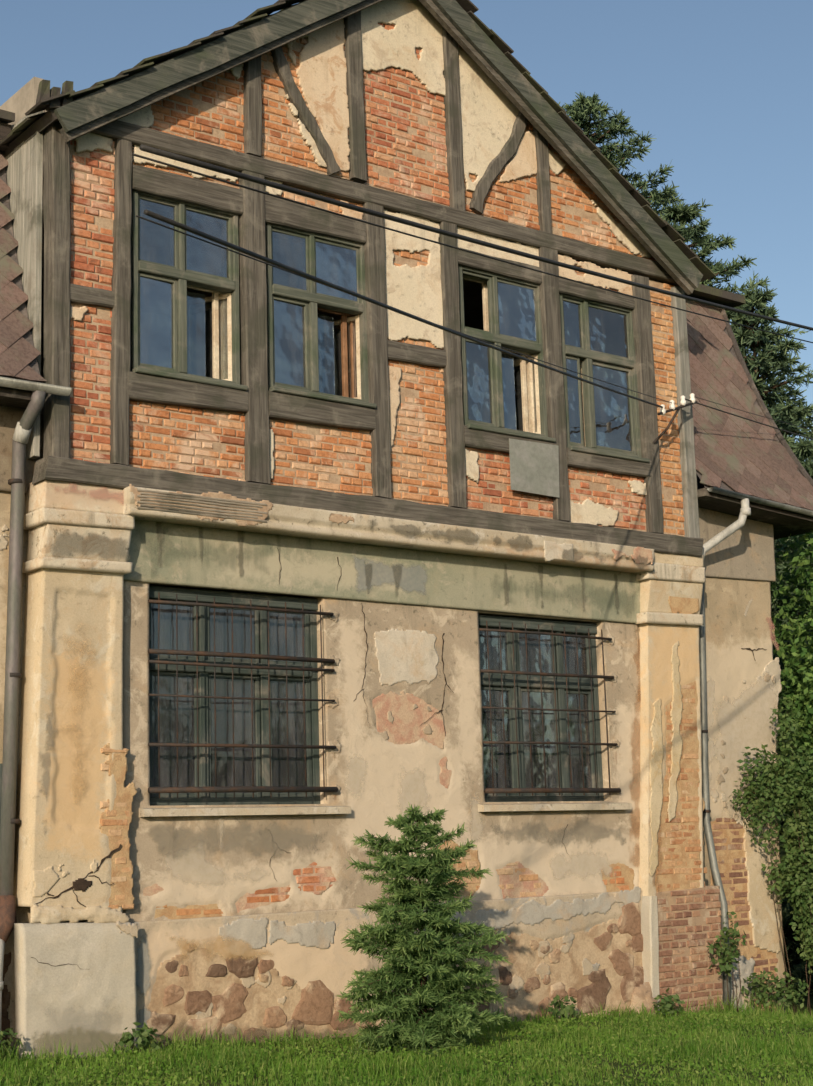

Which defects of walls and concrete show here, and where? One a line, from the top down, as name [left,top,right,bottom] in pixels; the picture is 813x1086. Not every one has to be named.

flaking render [129,484,273,527]
crack [354,606,369,723]
crack [420,633,454,736]
flaking render [372,691,452,789]
peeling [33,860,98,897]
crack [36,844,122,907]
flaking render [99,743,223,938]
flaking render [235,862,336,913]
flaking render [430,840,482,901]
flaking render [649,641,782,1014]
flaking render [449,861,644,1022]
flaking render [147,943,377,1048]